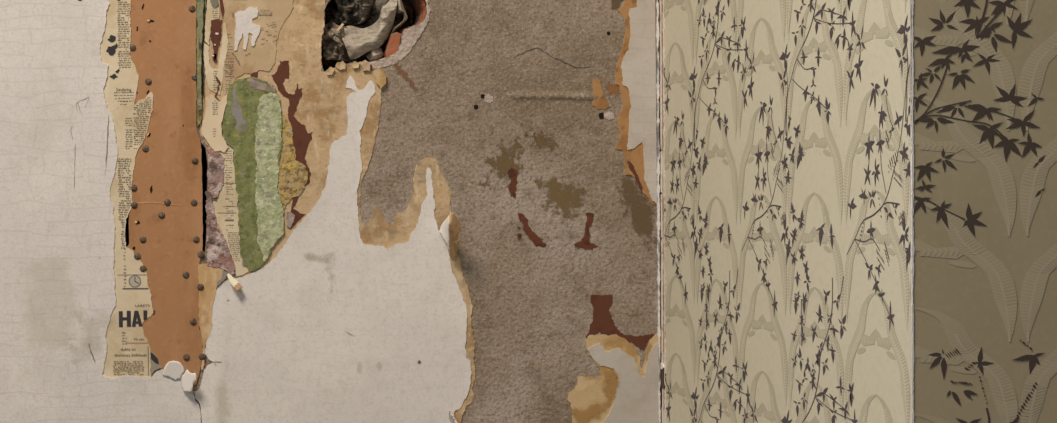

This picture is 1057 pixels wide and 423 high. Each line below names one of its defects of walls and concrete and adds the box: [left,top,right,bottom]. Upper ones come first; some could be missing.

spalling [370,0,431,68]
peeling [205,71,308,286]